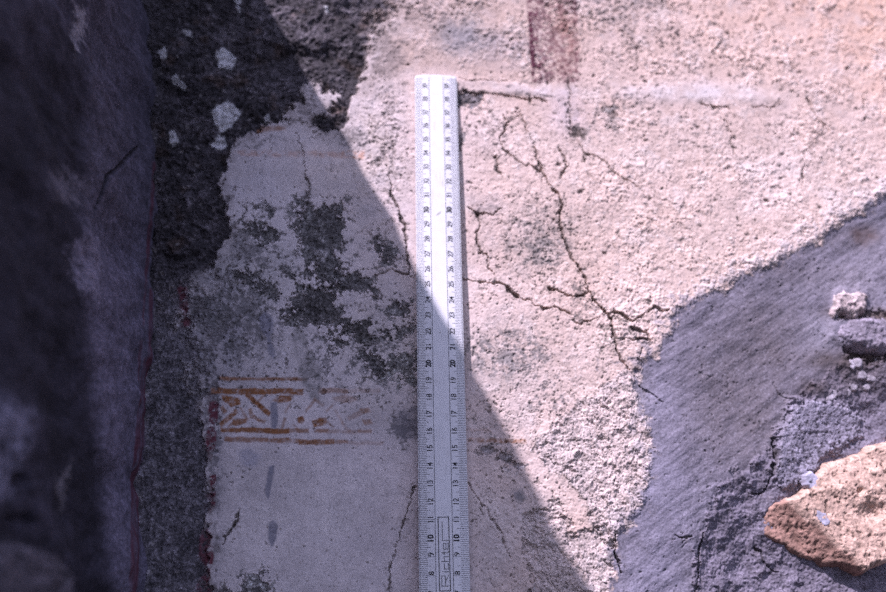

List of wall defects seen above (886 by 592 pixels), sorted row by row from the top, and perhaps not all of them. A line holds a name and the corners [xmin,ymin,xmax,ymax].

spalling [225,188,417,396]
crack [374,175,411,277]
crack [457,77,670,402]
crack [388,485,417,592]